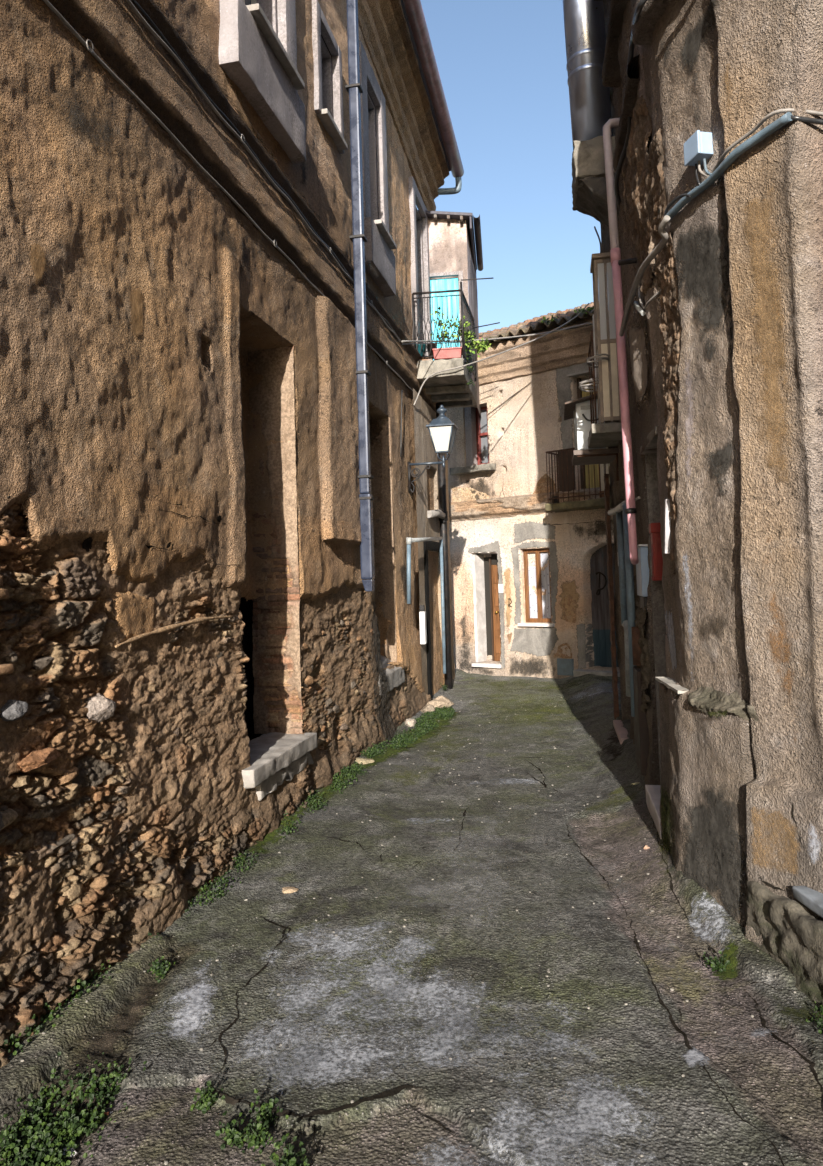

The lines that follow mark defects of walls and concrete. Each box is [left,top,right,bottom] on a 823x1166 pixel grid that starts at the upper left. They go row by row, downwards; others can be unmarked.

flaking render [621,95,682,575]
flaking render [0,496,431,1068]
leakage [682,789,746,941]
leakage [171,969,217,1042]
crack [167,916,458,1165]
leakage [244,922,591,1095]
leakage [421,1075,655,1166]
crack [567,821,823,1166]